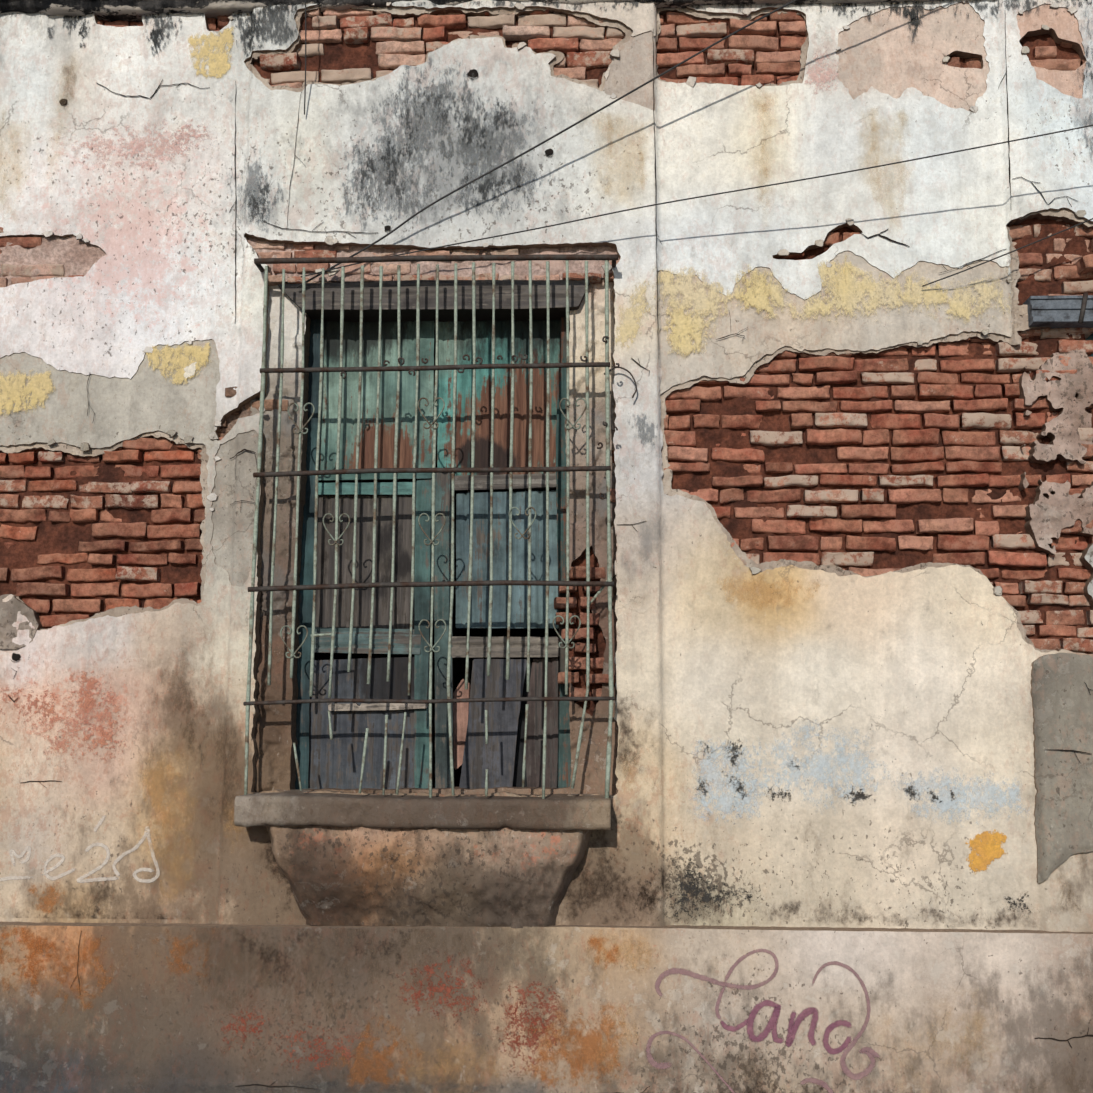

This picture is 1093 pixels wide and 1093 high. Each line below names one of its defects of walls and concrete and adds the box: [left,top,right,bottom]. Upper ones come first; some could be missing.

spalling [245,2,809,110]
peeling [836,0,990,113]
peeling [1016,2,1086,98]
water stain [361,87,445,198]
water stain [459,100,514,149]
water stain [467,171,523,205]
spalling [0,227,106,287]
spalling [656,209,1093,654]
spalling [0,339,290,662]
spalling [554,547,616,716]
water stain [649,854,763,921]
crack [1035,1028,1093,1048]